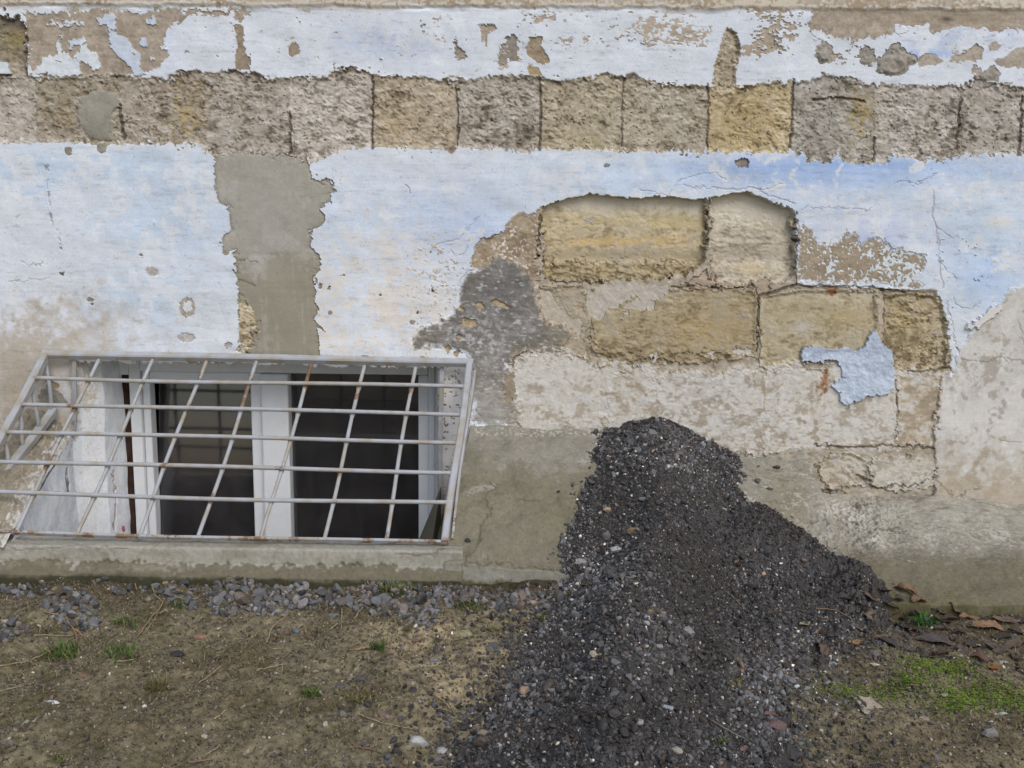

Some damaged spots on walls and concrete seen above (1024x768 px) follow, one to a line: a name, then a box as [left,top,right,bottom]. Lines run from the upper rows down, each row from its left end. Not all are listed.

spalling [0,6,1024,168]
spalling [224,300,261,354]
spalling [406,191,953,499]
crack [814,173,1024,450]
crack [395,481,555,574]
crack [821,474,984,509]